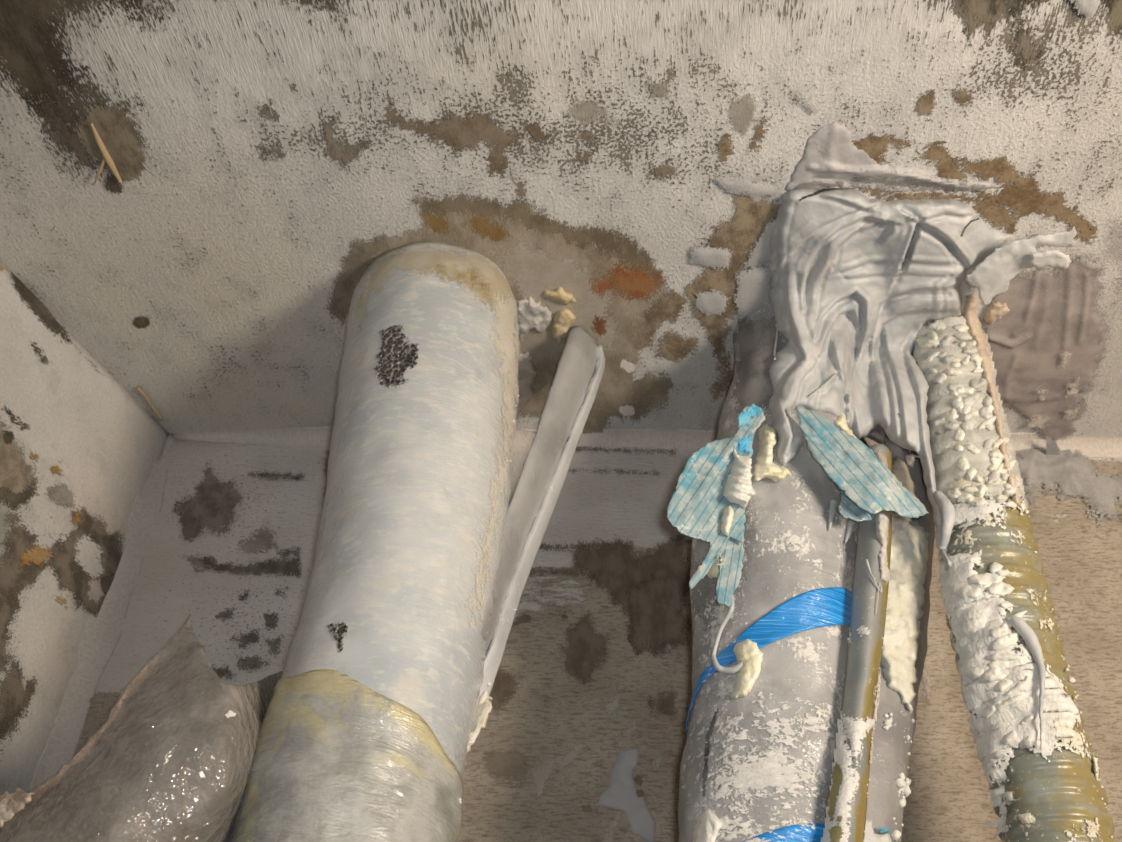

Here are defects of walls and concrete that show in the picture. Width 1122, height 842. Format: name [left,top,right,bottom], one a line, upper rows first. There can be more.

mould [280,0,357,31]
leakage [950,0,1122,71]
mould [0,0,183,189]
leakage [254,98,280,128]
leakage [318,112,373,169]
leakage [380,100,557,203]
leakage [646,158,678,181]
leakage [715,112,770,168]
leakage [851,132,1098,245]
rust [589,261,663,301]
leakage [172,462,278,561]
leakage [0,510,45,754]